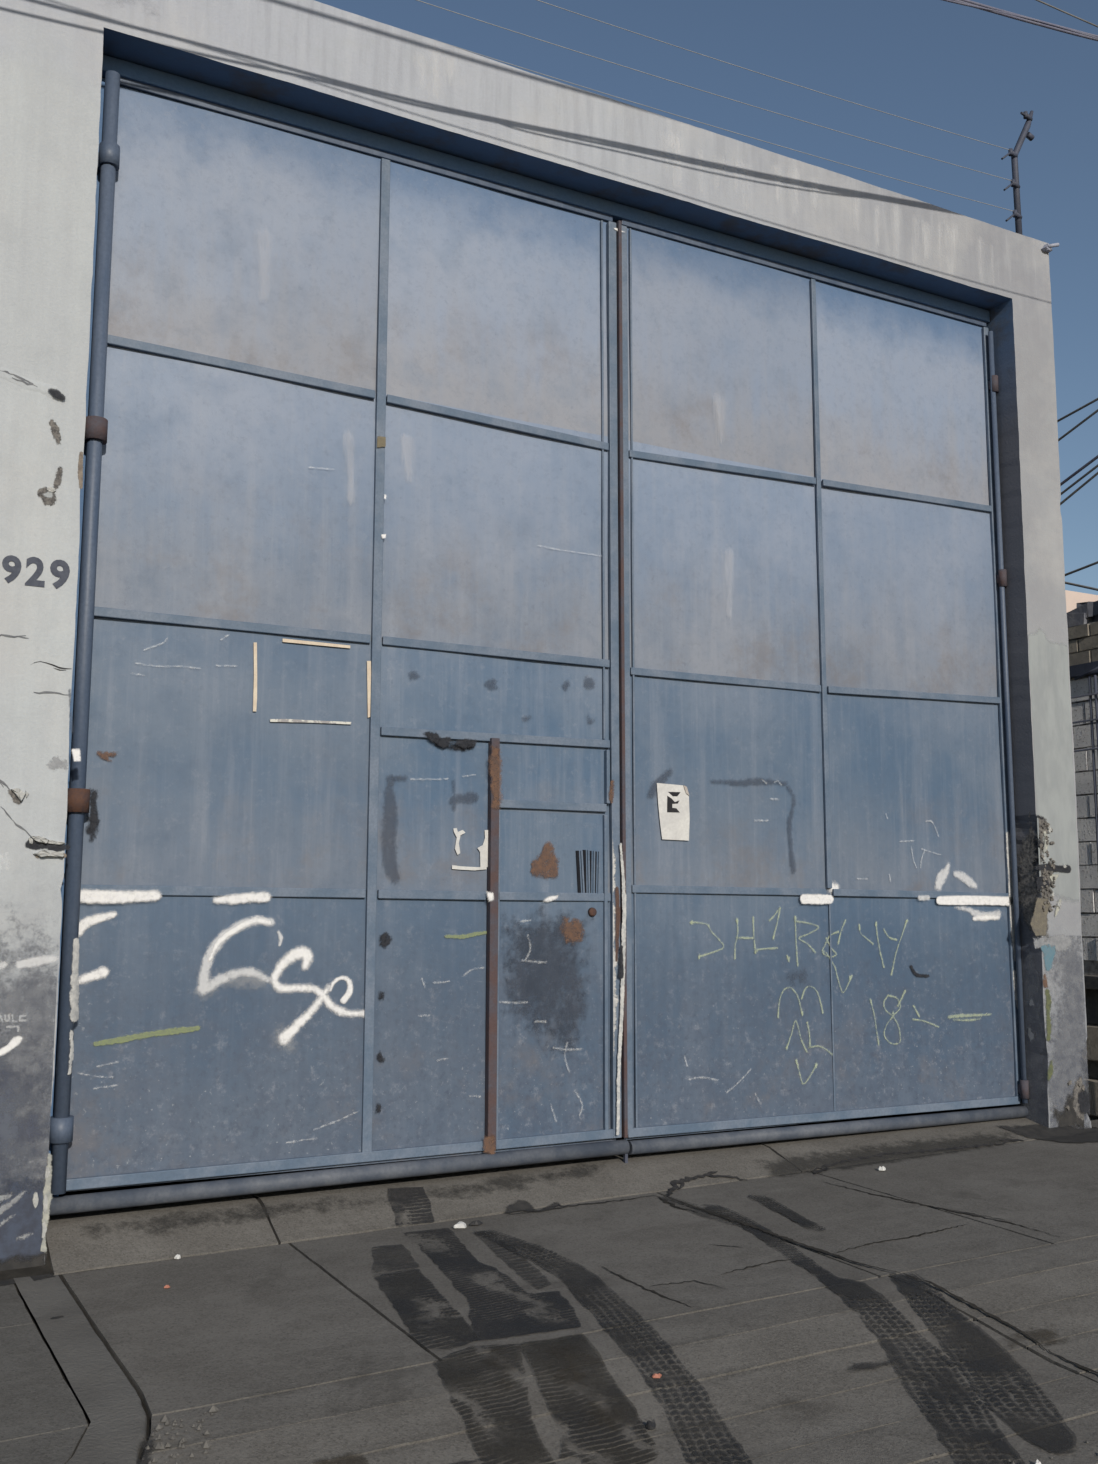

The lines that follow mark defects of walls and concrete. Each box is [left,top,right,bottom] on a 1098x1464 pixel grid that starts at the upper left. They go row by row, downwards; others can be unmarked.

spalling [48,388,65,400]
peeling [49,420,61,444]
peeling [38,452,83,506]
corrosion [489,745,503,809]
corrosion [531,842,559,878]
spalling [1017,812,1071,938]
corrosion [560,917,584,943]
damp [506,918,583,1045]
corrosion [483,1135,495,1154]